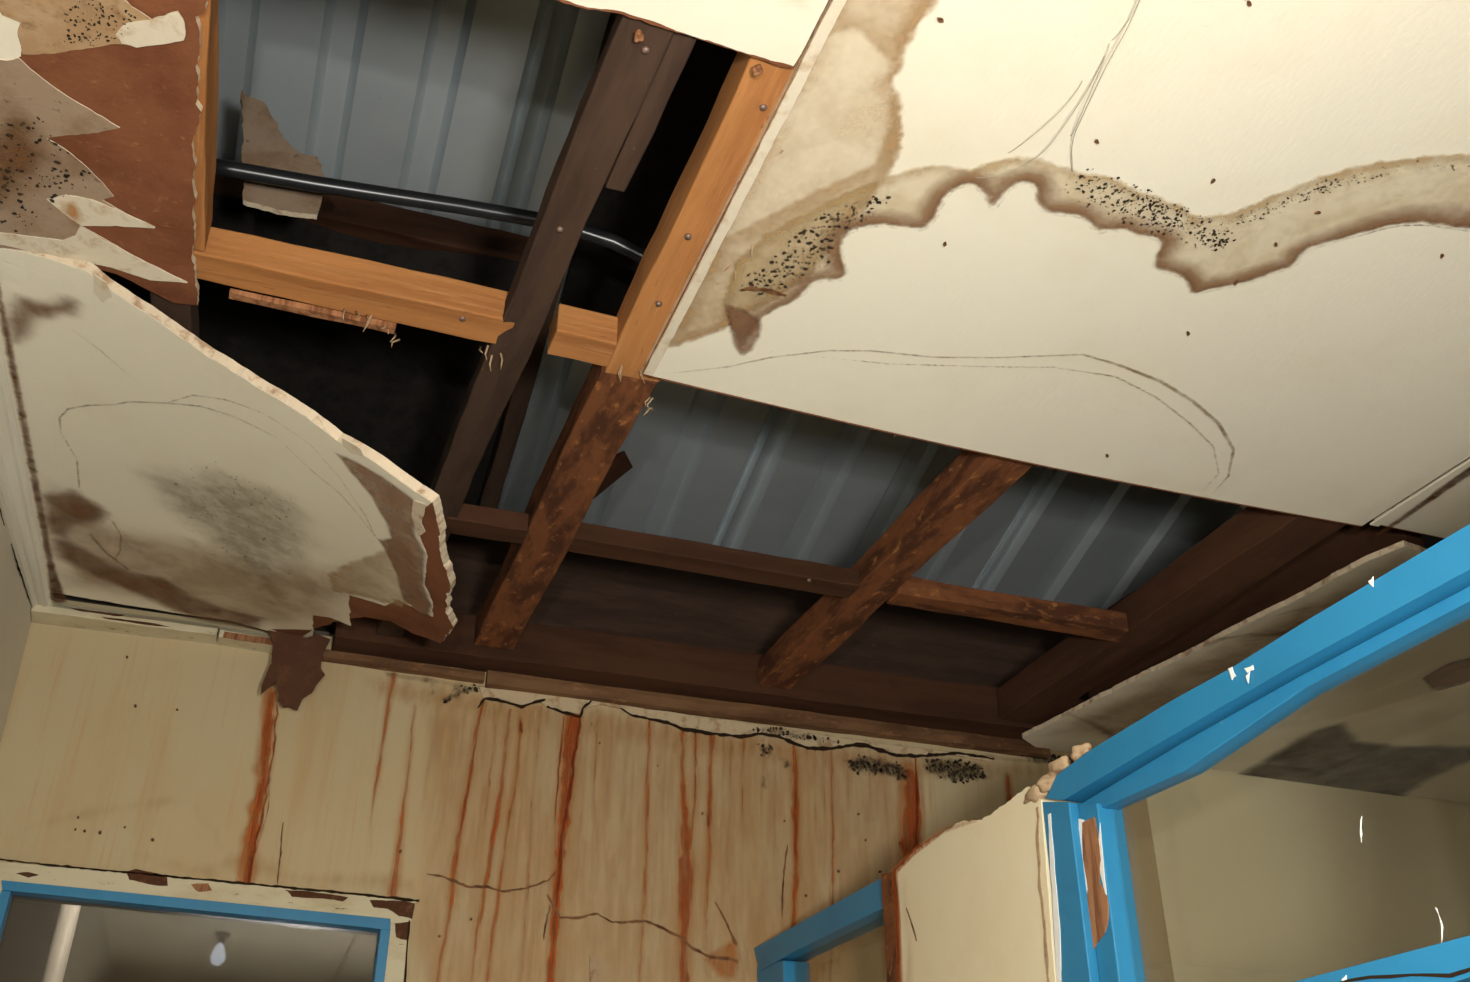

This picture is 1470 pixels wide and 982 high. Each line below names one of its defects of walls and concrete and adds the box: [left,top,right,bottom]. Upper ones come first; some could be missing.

peeling [0,0,187,303]
water stain [708,155,1470,353]
water stain [0,291,258,626]
water stain [329,457,431,616]
rust [241,691,278,883]
crack [0,822,738,982]
peeling [370,900,415,940]
rust [547,714,581,982]
rust [679,730,713,982]
crack [477,697,995,760]
peeling [1078,817,1109,949]
crack [1340,968,1470,982]